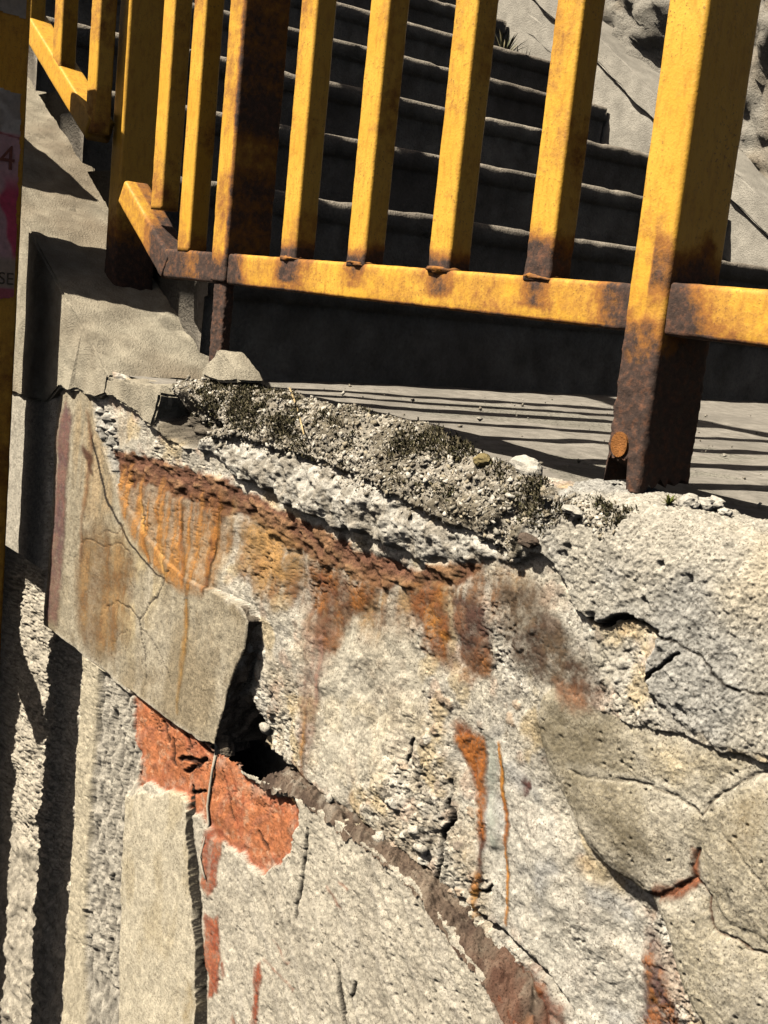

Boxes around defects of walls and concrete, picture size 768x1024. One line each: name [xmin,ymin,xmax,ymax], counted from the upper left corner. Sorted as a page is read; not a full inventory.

spalling [49,396,61,545]
crack [81,435,175,692]
corrosion [114,451,593,762]
spalling [95,372,768,1024]
corrosion [455,724,509,924]
crack [573,770,759,816]
crack [591,614,768,696]